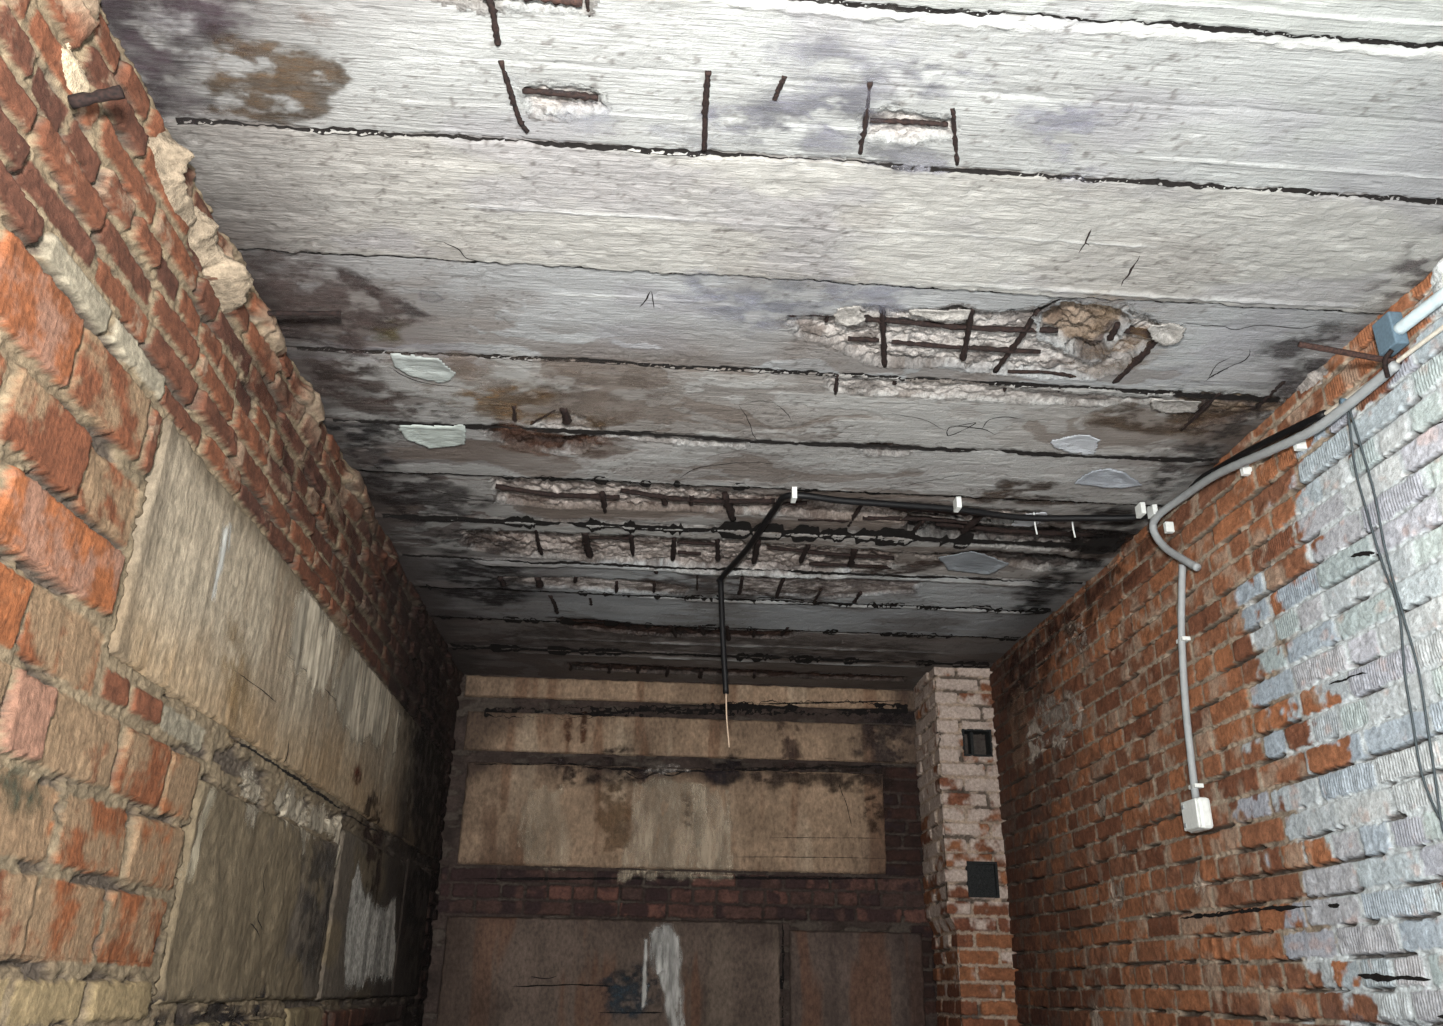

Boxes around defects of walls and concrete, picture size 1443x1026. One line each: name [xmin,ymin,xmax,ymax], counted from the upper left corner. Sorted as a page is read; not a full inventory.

crack [789,0,1443,49]
damp [100,0,351,124]
crack [175,117,1443,205]
damp [251,259,491,526]
damp [454,367,618,429]
spalling [776,297,1293,431]
damp [978,480,1075,505]
spalling [452,475,1121,641]
crack [1350,550,1379,558]
crack [1329,672,1366,685]
crack [1182,903,1339,919]
crack [1358,973,1431,982]